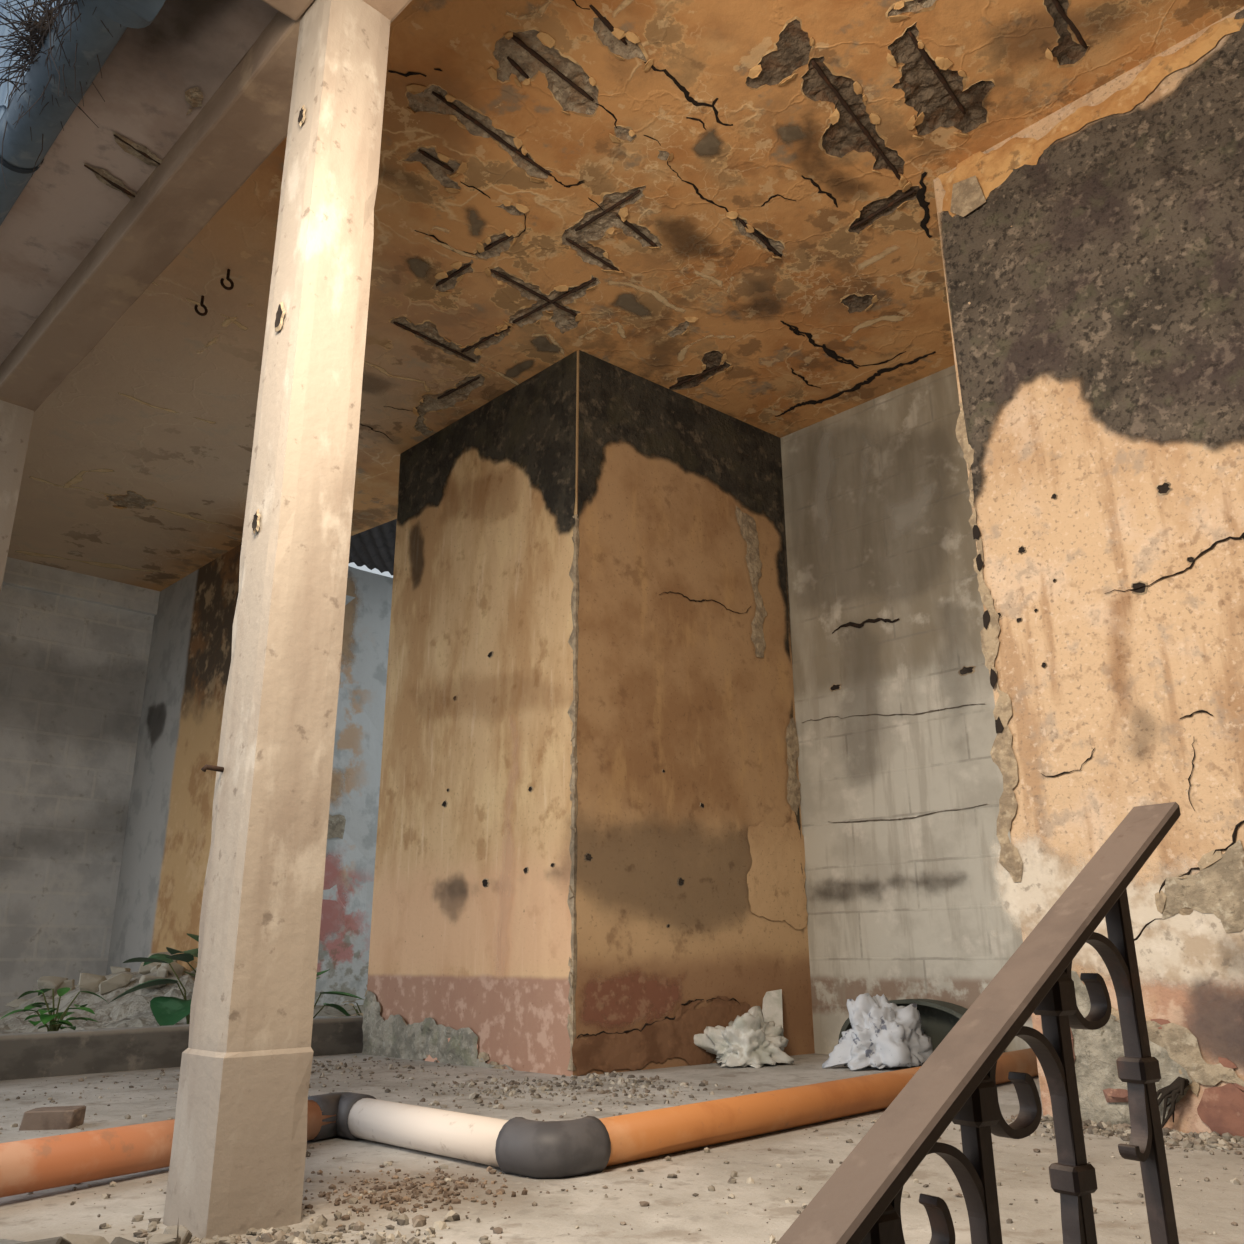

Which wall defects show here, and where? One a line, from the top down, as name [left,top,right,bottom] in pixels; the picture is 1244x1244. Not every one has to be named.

crack [644,62,733,130]
crack [596,103,838,256]
spalling [745,16,920,236]
spalling [885,0,995,140]
spalling [364,185,735,435]
crack [1105,533,1244,594]
leakage [997,838,1084,933]
leakage [1074,917,1109,975]
leakage [1126,869,1244,1065]
crack [1134,820,1244,941]
spalling [1070,970,1131,1125]
spalling [1146,1019,1244,1137]